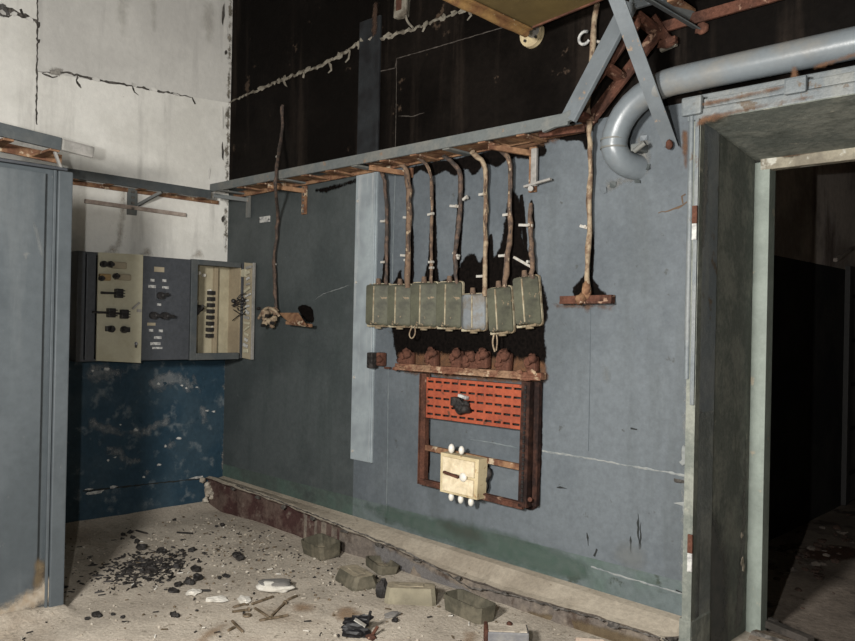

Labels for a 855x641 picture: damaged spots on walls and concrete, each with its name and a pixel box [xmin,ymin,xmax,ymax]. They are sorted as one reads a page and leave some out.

crack [0,0,196,125]
rust [698,93,752,124]
spalling [298,305,314,323]
peeling [150,372,206,390]
spalling [200,477,214,502]